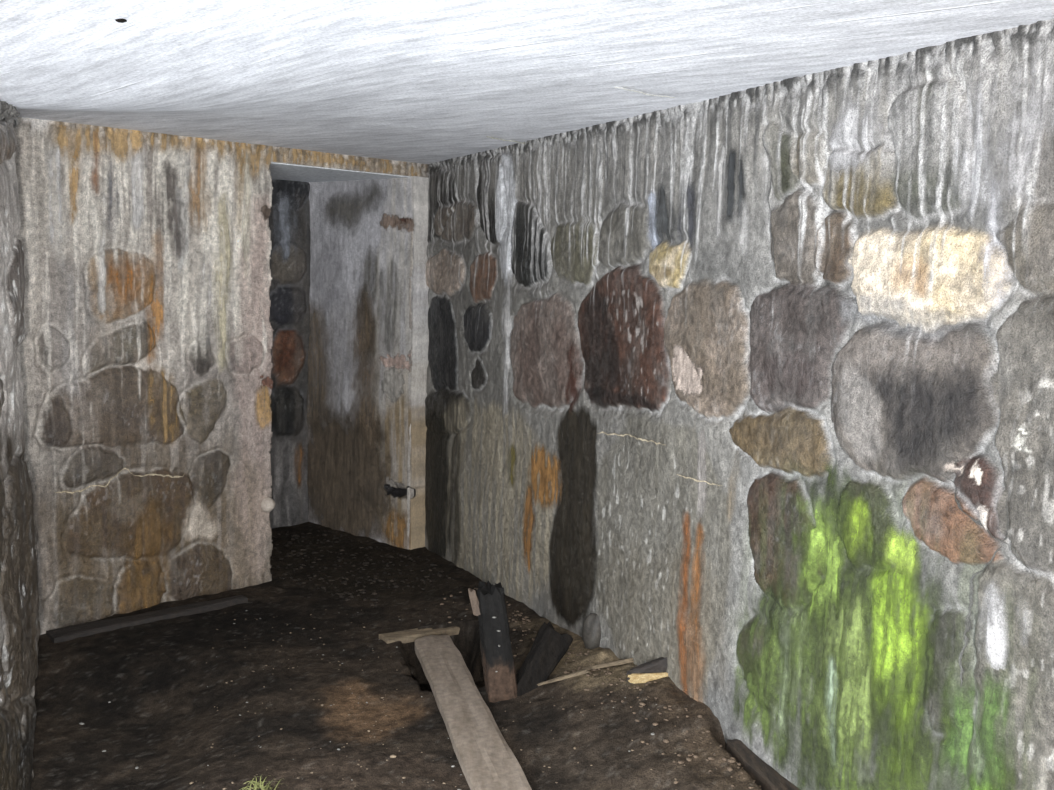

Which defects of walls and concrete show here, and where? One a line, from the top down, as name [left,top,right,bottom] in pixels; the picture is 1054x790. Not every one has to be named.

rust [57,124,367,221]
damp [326,186,380,227]
damp [307,254,397,538]
rust [523,447,559,571]
rust [679,517,703,702]
damp [986,586,1006,669]
damp [1038,763,1047,790]